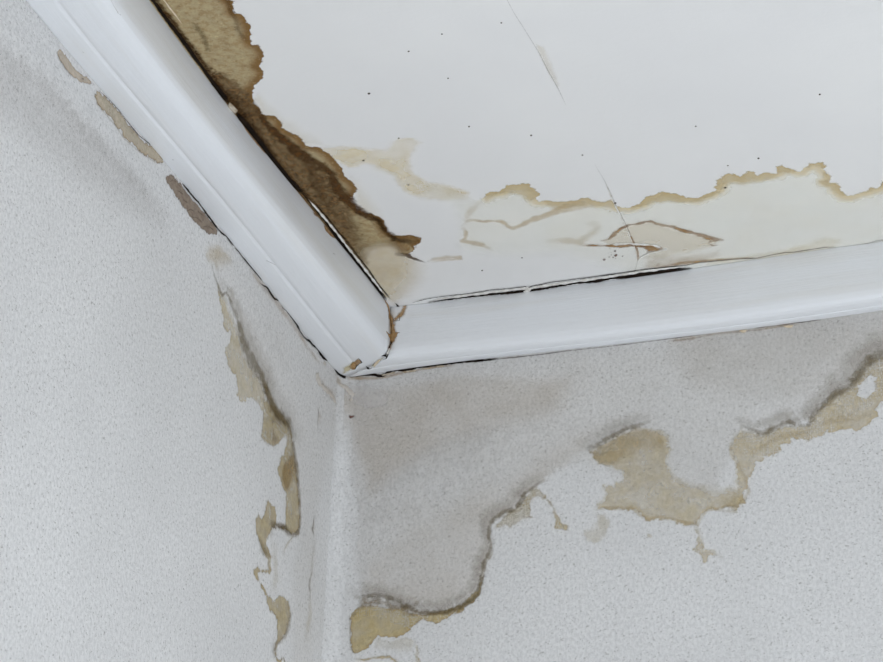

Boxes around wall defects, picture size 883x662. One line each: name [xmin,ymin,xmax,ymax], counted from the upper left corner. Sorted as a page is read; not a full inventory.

peeling [58,50,91,84]
peeling [95,92,163,163]
peeling [166,175,218,235]
crack [151,0,827,378]
water stain [486,163,883,211]
water stain [350,582,482,660]